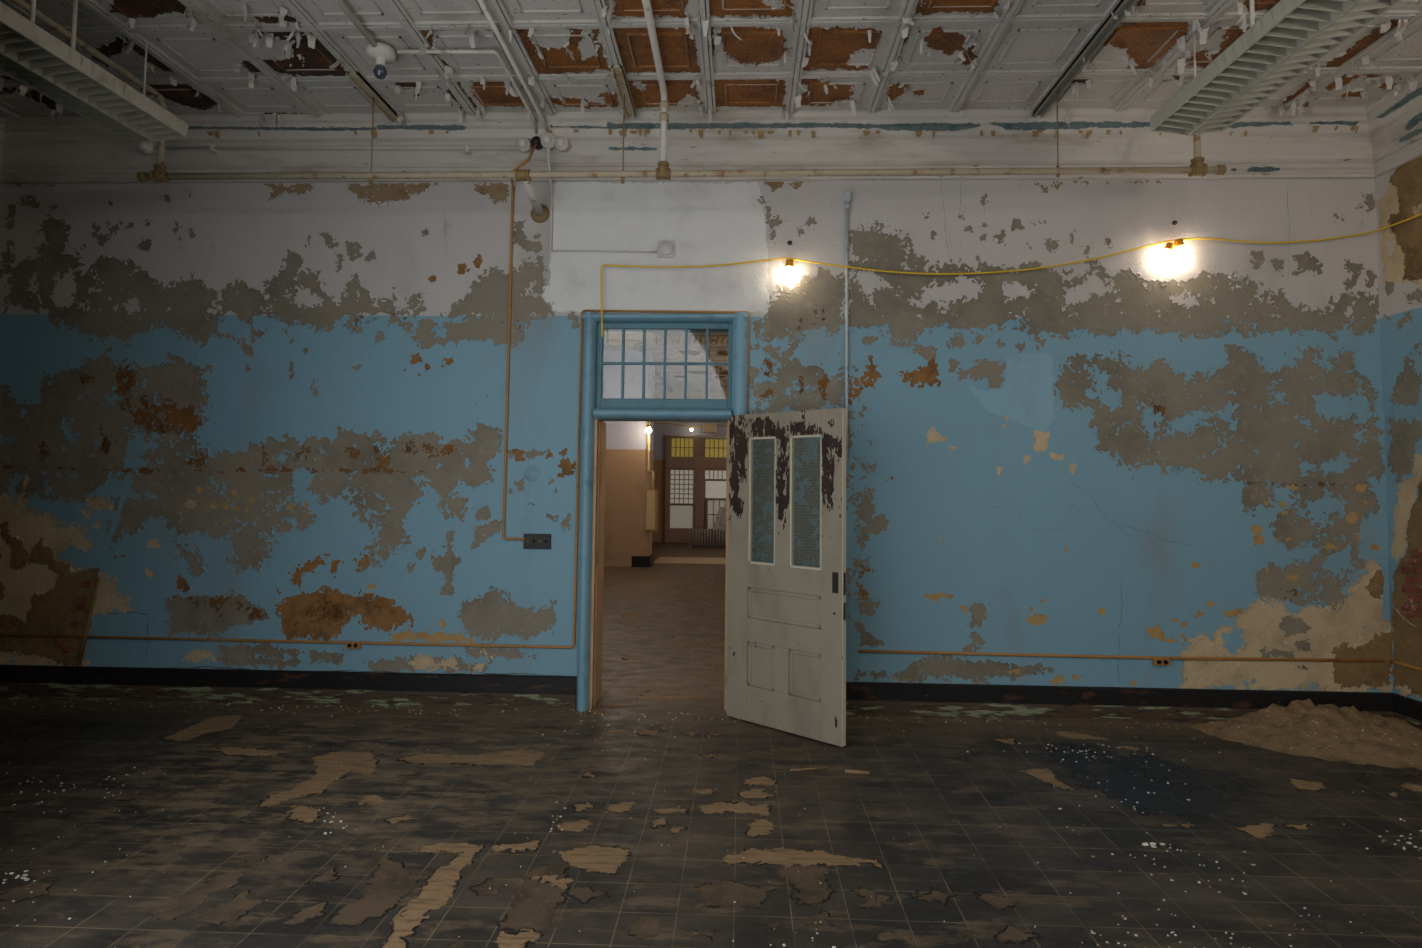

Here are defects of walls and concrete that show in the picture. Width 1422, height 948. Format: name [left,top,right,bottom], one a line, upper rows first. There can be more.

peeling [371,0,1013,132]
peeling [0,189,580,674]
peeling [729,156,1422,699]
peeling [289,856,436,948]
peeling [496,914,544,948]
peeling [528,844,632,910]